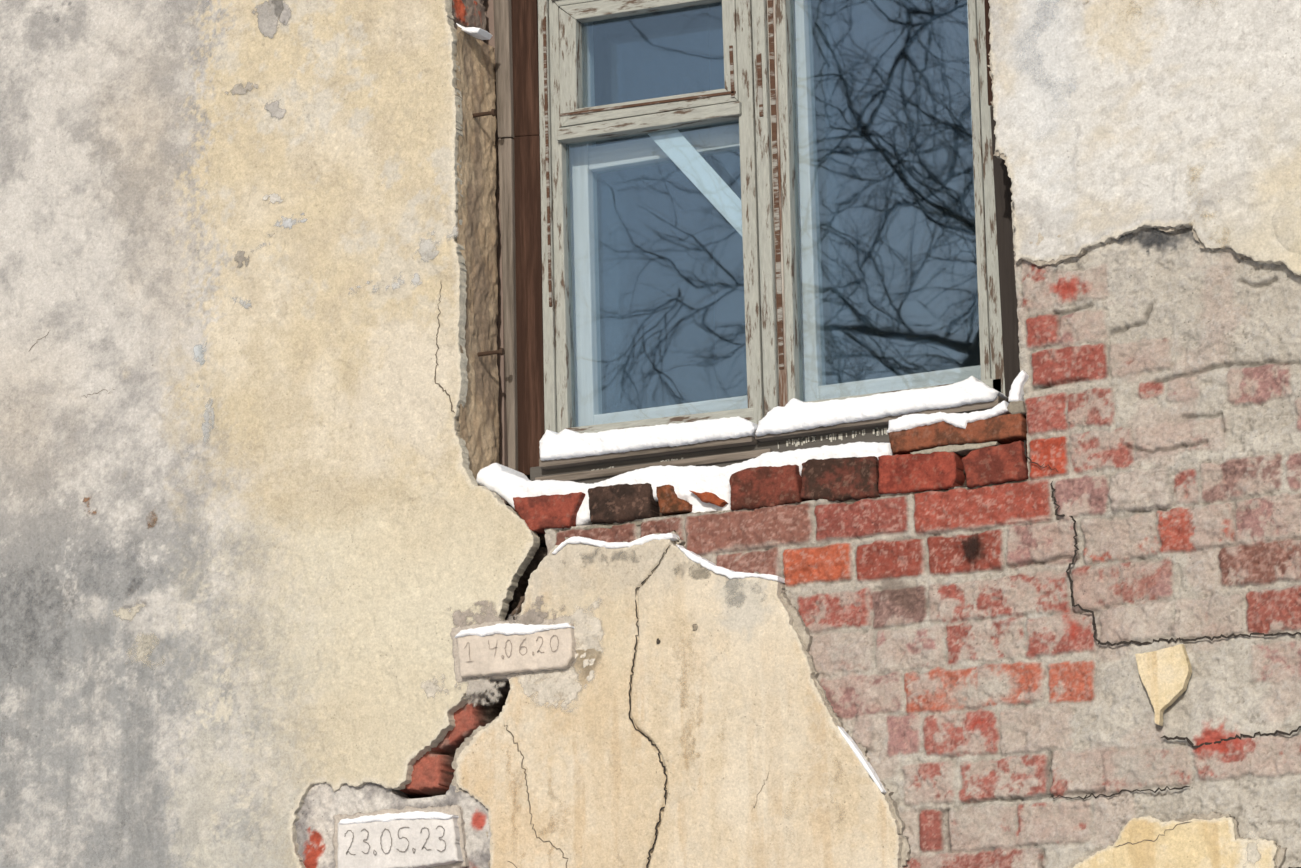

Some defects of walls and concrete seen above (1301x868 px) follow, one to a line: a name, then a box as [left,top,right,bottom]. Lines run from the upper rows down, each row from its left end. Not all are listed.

spalling [451,0,486,41]
crack [434,283,455,413]
crack [508,543,548,620]
spalling [506,201,1301,868]
crack [1024,440,1301,646]
spalling [294,782,491,868]
crack [400,681,568,868]
crack [628,546,669,868]
crack [1049,786,1190,800]
crack [1116,822,1189,847]
crack [1161,726,1301,748]